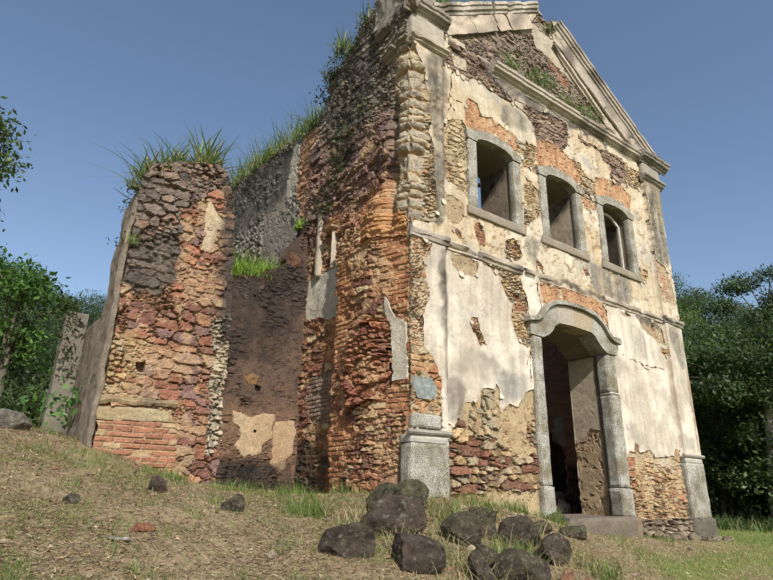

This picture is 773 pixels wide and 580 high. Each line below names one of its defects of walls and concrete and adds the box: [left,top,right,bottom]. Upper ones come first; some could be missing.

spalling [360,15,645,516]
flaking render [339,316,393,409]
spalling [627,449,693,520]